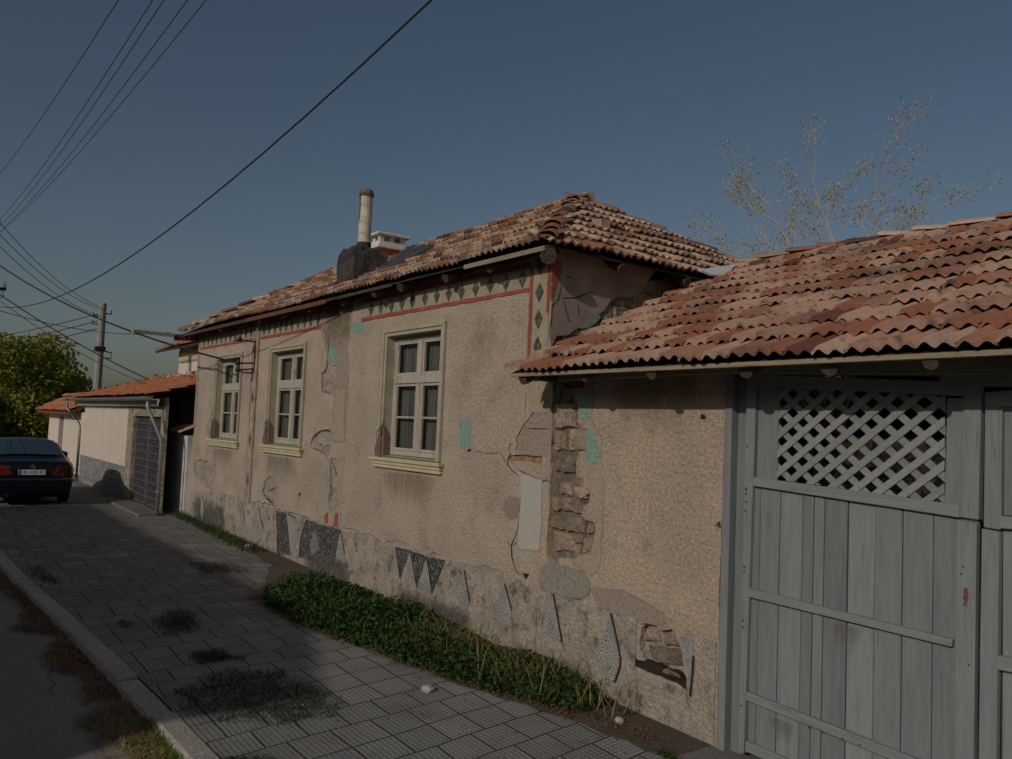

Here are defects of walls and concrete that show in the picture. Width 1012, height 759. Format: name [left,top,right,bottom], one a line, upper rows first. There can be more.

crack [549,276,593,340]
flaking render [312,303,363,527]
flaking render [511,403,552,482]
flaking render [573,380,617,576]
flaking render [635,624,687,689]